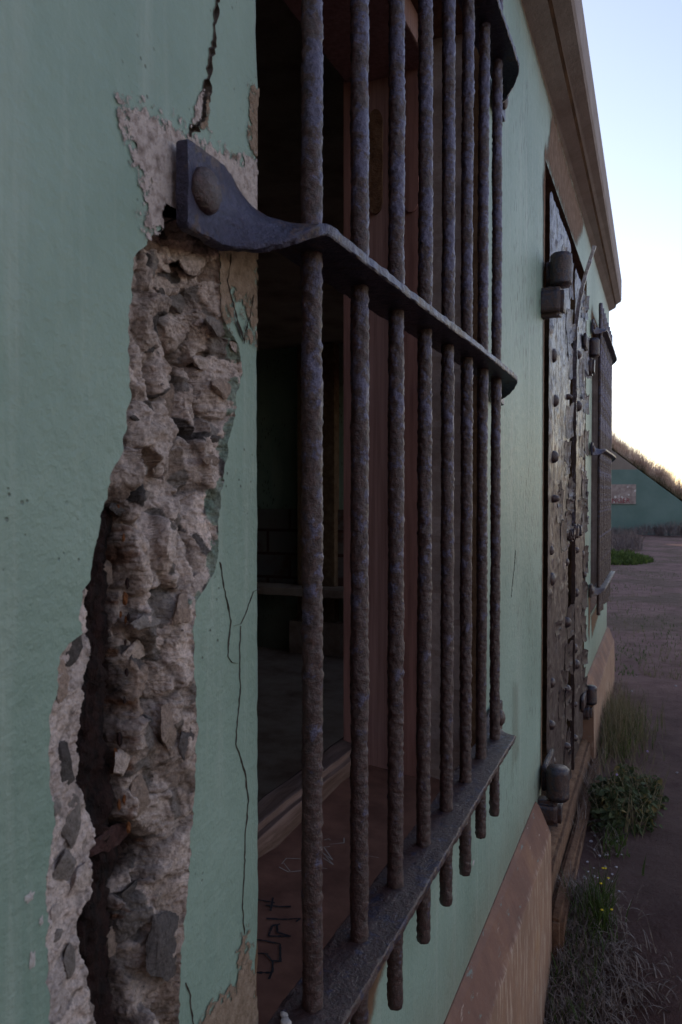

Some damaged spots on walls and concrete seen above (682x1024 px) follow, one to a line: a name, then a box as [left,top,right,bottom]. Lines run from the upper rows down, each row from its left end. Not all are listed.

crack [189,0,220,138]
spalling [24,76,260,1024]
crack [219,562,259,934]